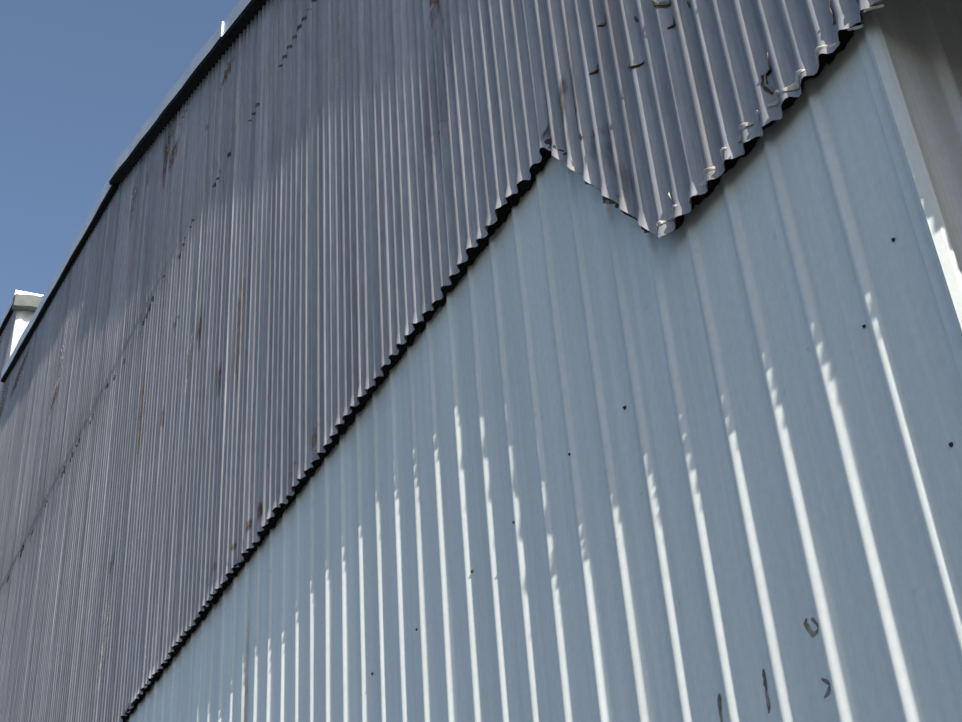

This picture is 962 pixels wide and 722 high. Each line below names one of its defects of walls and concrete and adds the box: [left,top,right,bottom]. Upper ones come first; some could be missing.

peeling [652,0,675,29]
peeling [761,52,773,95]